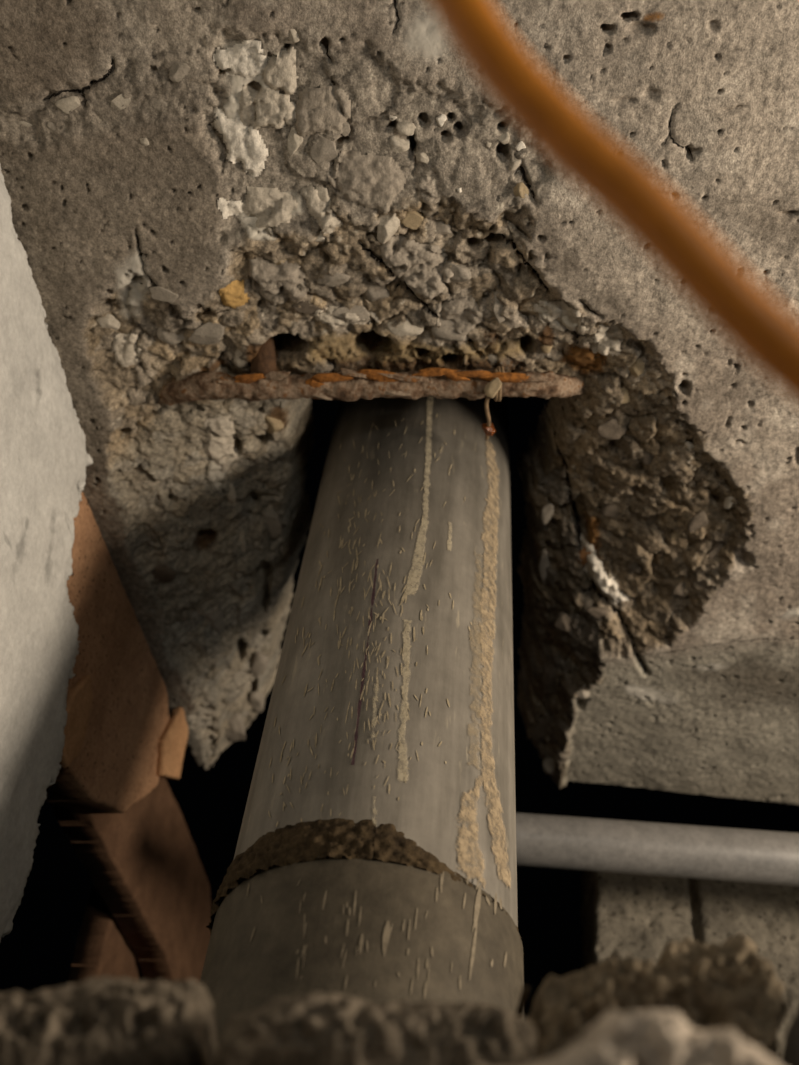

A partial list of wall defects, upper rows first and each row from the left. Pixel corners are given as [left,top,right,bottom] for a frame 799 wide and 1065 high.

crack [44,59,113,104]
corrosion [338,328,526,373]
spalling [0,29,755,789]